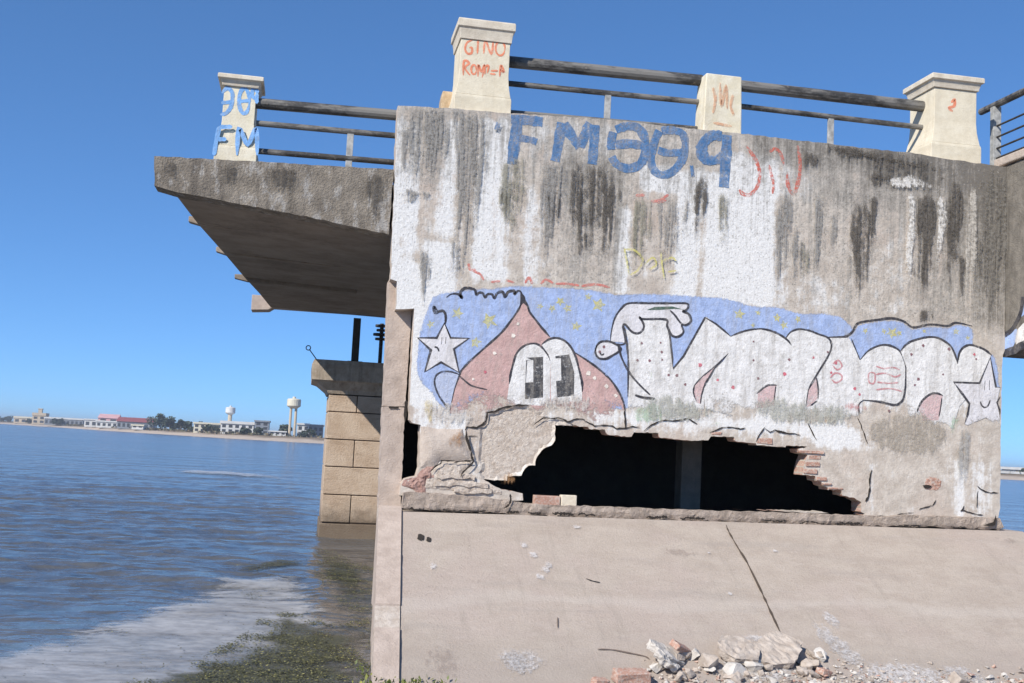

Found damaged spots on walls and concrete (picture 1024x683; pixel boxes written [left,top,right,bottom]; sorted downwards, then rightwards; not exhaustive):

leakage [401,108,487,274]
leakage [499,157,525,230]
leakage [539,163,621,258]
leakage [630,177,728,263]
leakage [828,145,1008,305]
flaking render [402,408,571,495]
crack [408,494,595,517]
crack [763,470,872,526]
flaking render [796,450,843,490]
crack [897,500,936,527]
flaking render [923,477,941,490]
crack [646,515,780,631]